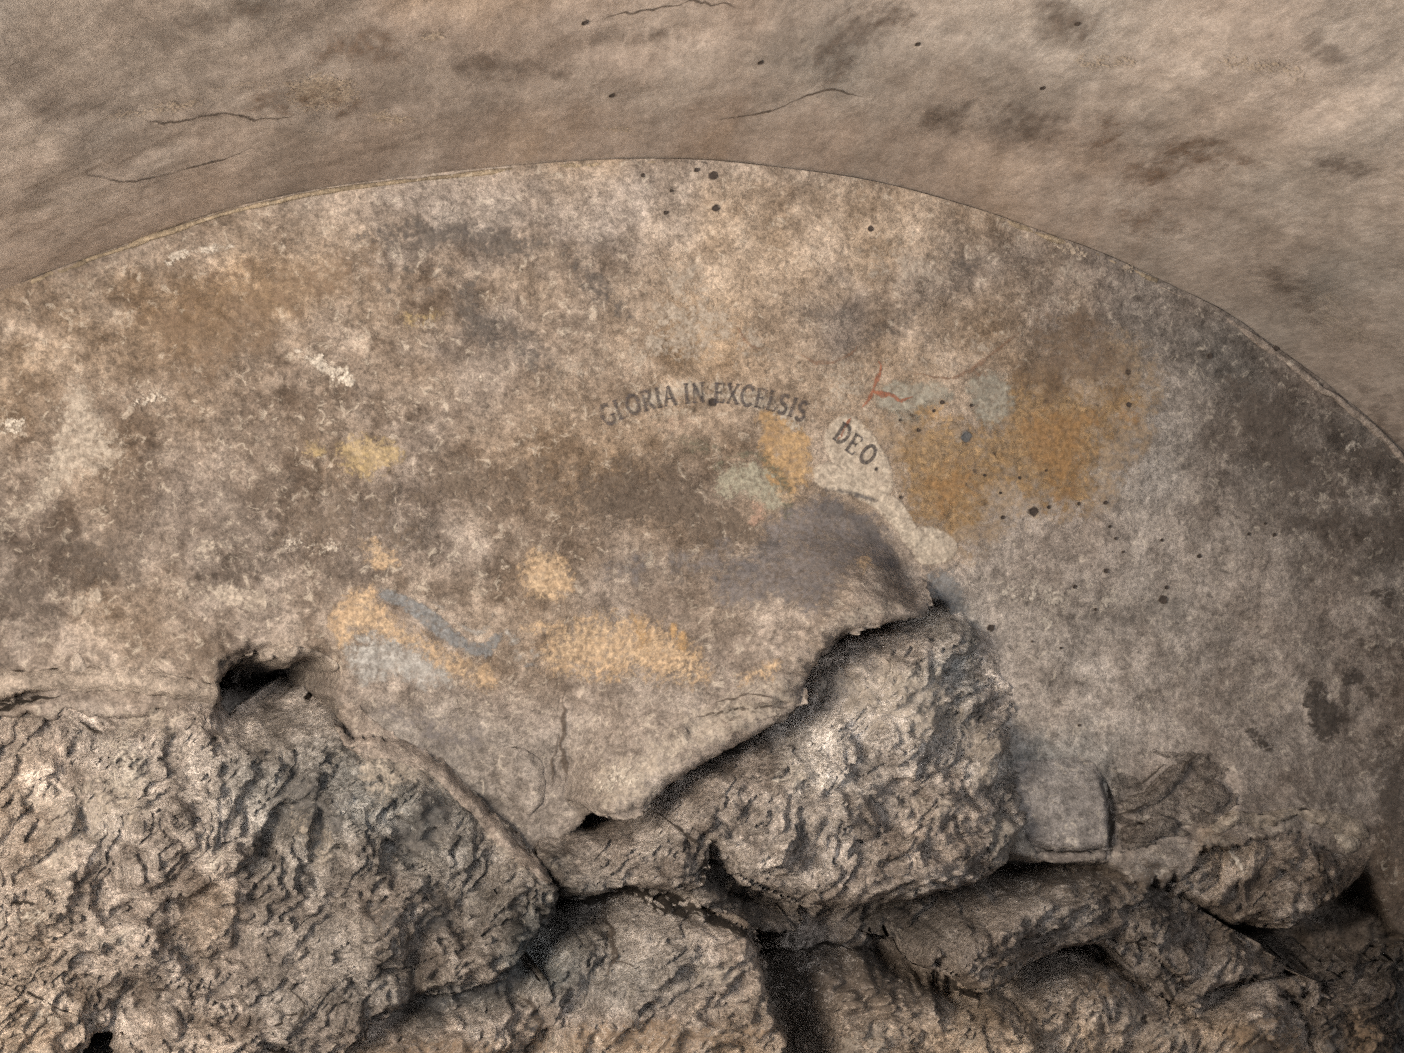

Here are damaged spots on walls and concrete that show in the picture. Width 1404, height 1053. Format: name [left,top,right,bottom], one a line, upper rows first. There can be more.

crack [0,695,102,735]
peeling [0,646,339,704]
crack [550,691,568,788]
crack [695,693,781,718]
crack [1039,751,1199,859]
crack [655,812,709,889]
crack [11,899,35,907]
crack [598,884,634,976]
crack [760,941,878,953]
crack [0,982,82,1018]
crack [266,983,305,1053]
crack [1213,974,1327,1053]